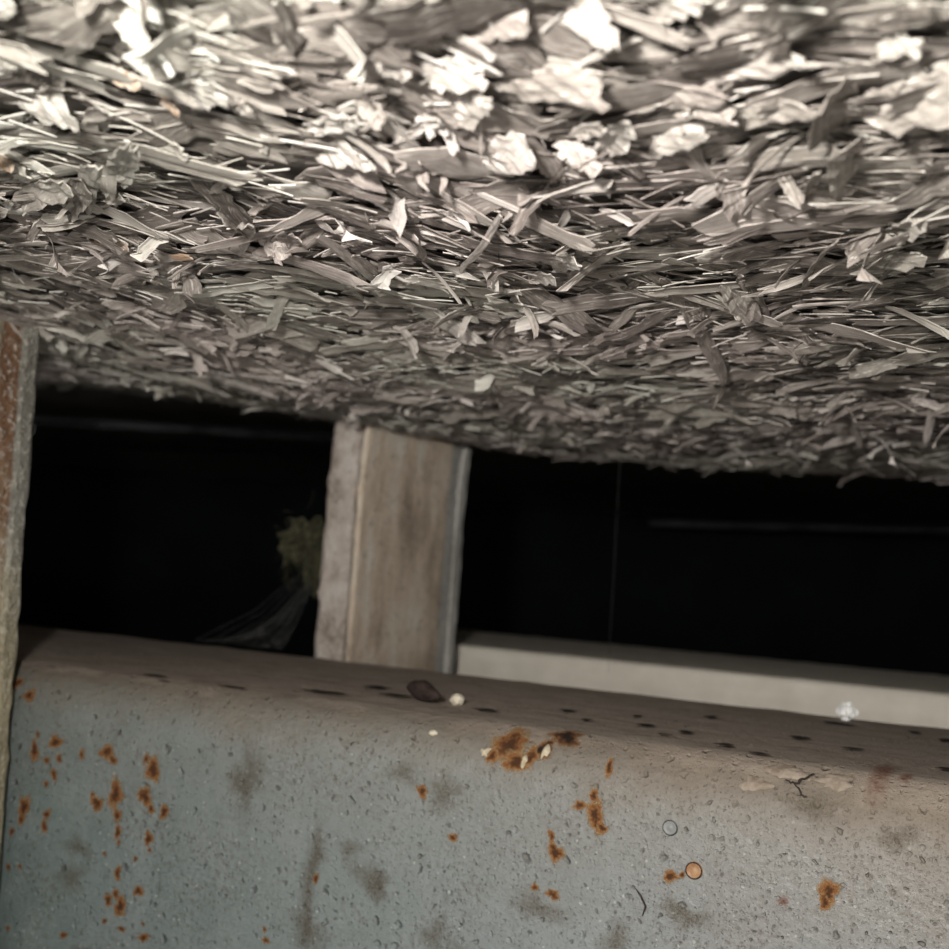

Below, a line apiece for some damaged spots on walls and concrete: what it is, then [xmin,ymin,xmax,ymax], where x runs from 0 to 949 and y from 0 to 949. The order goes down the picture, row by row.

rust [12,678,36,702]
rust [29,730,64,788]
rust [485,727,584,771]
rust [9,795,31,837]
rust [41,809,51,833]
rust [90,744,169,846]
rust [144,830,154,852]
rust [547,829,565,863]
rust [573,788,608,836]
rust [102,865,144,932]
rust [817,879,841,910]